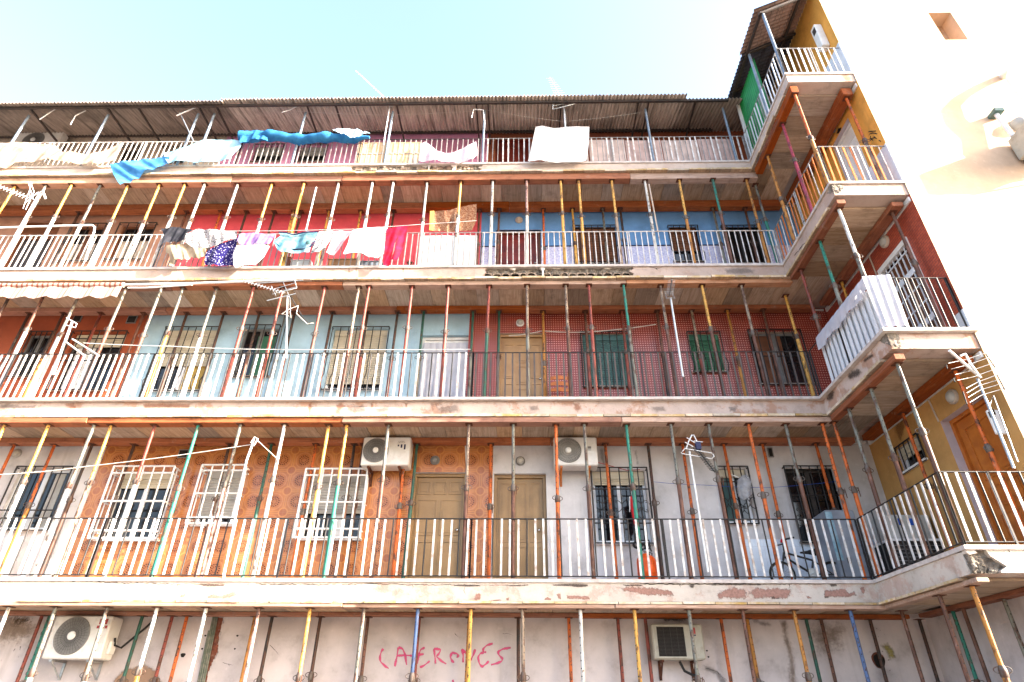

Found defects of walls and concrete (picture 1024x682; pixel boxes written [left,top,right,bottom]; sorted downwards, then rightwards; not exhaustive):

spalling [962,550,1012,574]
peeling [621,586,673,596]
peeling [718,587,790,600]
peeling [825,587,865,597]